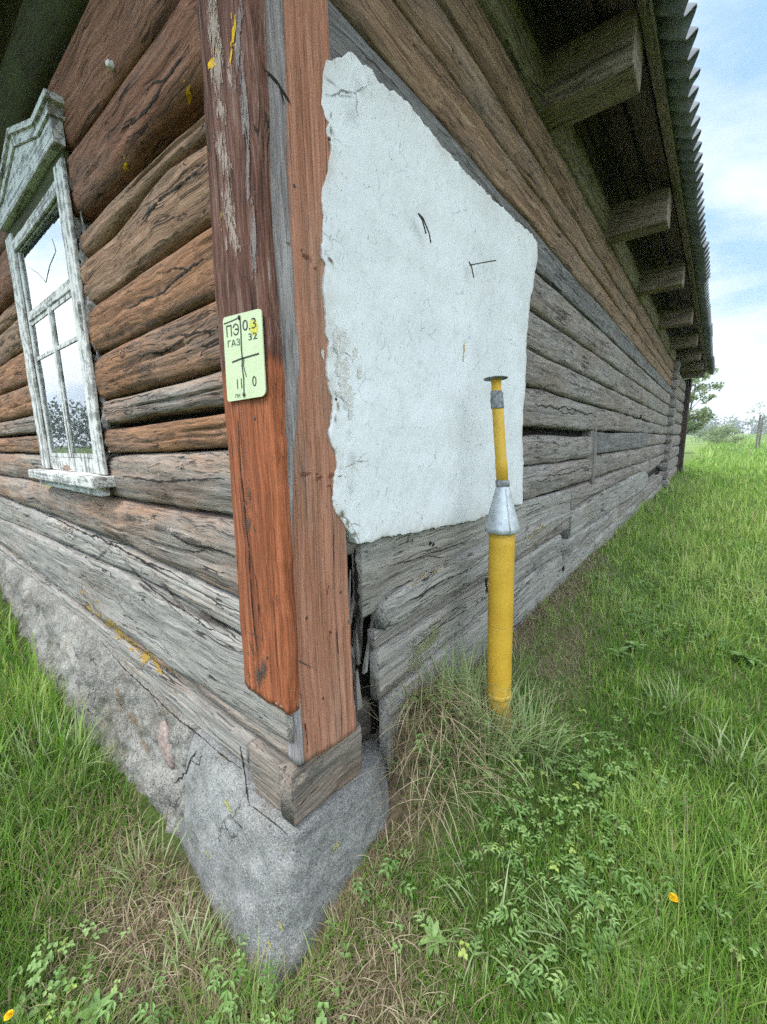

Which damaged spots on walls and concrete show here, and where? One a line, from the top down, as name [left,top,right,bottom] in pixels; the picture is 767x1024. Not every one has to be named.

peeling [321,325,362,420]
crack [104,645,287,834]